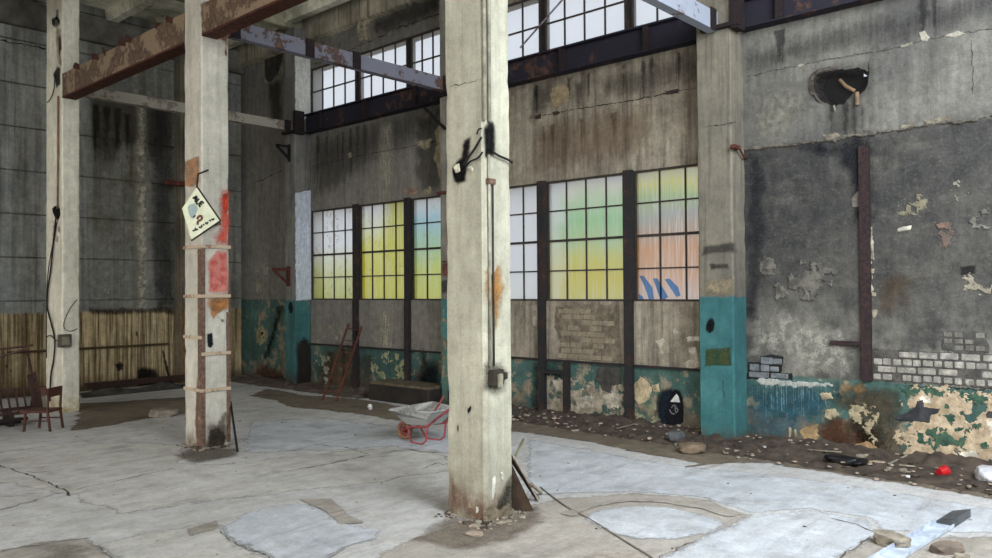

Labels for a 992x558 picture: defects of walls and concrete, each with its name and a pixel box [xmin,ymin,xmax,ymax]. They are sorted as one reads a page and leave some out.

spalling [809,59,870,114]
leakage [811,137,867,195]
flaking render [897,194,933,218]
leakage [93,101,186,375]
flaking render [934,221,955,249]
flaking render [962,273,992,296]
peeling [313,324,343,385]
peeling [370,351,413,380]
leakage [757,319,845,369]
flaking render [547,374,661,423]
flaking render [872,330,992,461]
leakage [497,476,513,510]